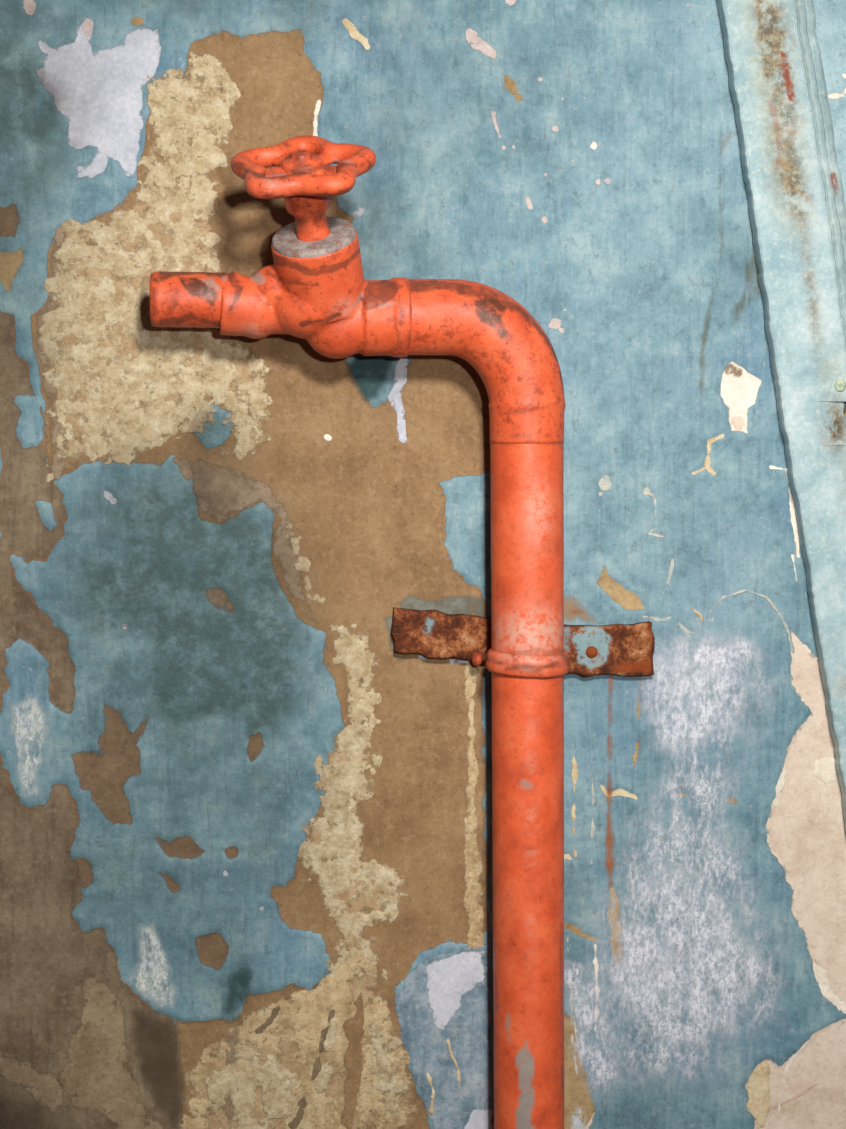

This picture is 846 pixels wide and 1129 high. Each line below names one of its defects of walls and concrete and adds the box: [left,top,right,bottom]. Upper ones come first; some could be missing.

peeling [0,17,497,1129]
damp [571,1107,585,1129]
peeling [564,966,596,1129]
damp [564,639,776,1089]
peeling [745,631,846,1129]